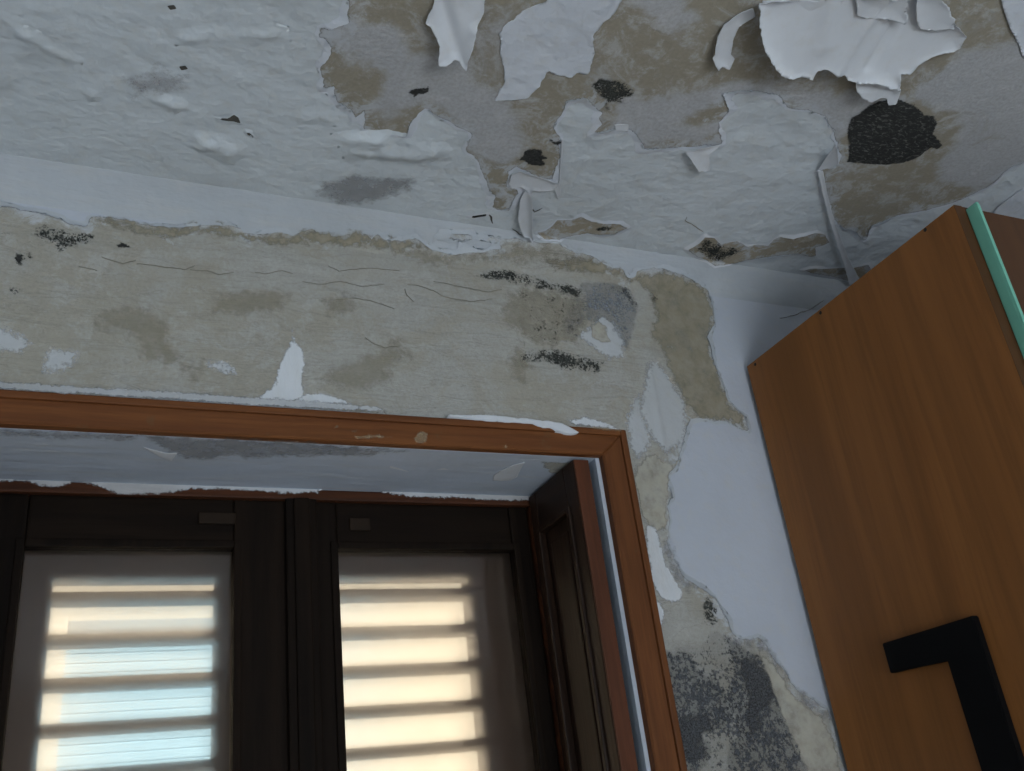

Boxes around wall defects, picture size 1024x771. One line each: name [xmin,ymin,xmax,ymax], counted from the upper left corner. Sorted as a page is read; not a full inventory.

peeling [315,0,1024,242]
mould [847,99,942,165]
mould [36,225,93,251]
crack [79,257,502,309]
water stain [480,257,743,424]
peeling [0,201,847,771]
mould [703,597,717,625]
water stain [667,637,841,771]